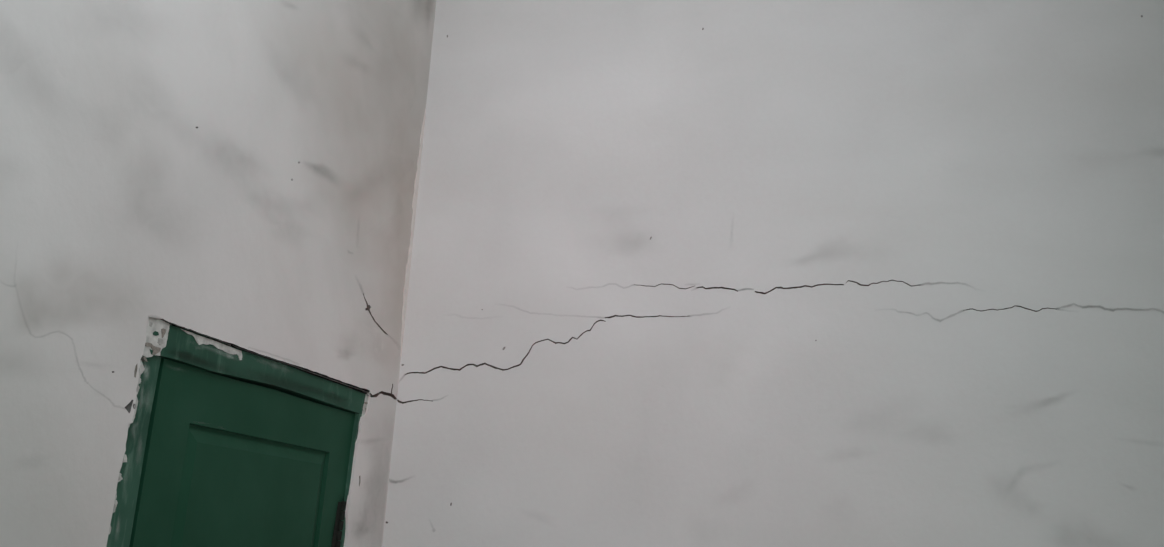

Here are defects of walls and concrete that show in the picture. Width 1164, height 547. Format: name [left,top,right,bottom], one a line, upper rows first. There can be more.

crack [161,280,919,404]
crack [963,304,1057,312]